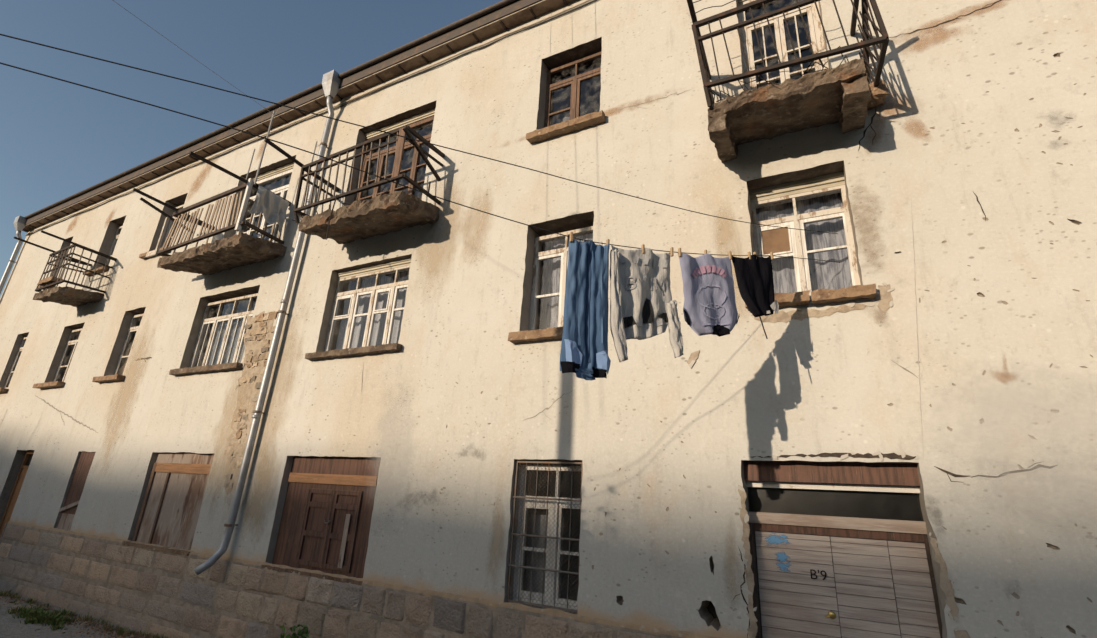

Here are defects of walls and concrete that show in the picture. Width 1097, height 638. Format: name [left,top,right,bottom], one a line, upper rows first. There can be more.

crack [889,0,1002,38]
spalling [801,46,849,76]
crack [893,200,1058,482]
spalling [223,311,278,495]
spalling [752,451,920,461]
spalling [929,526,971,638]
hole [698,600,721,631]